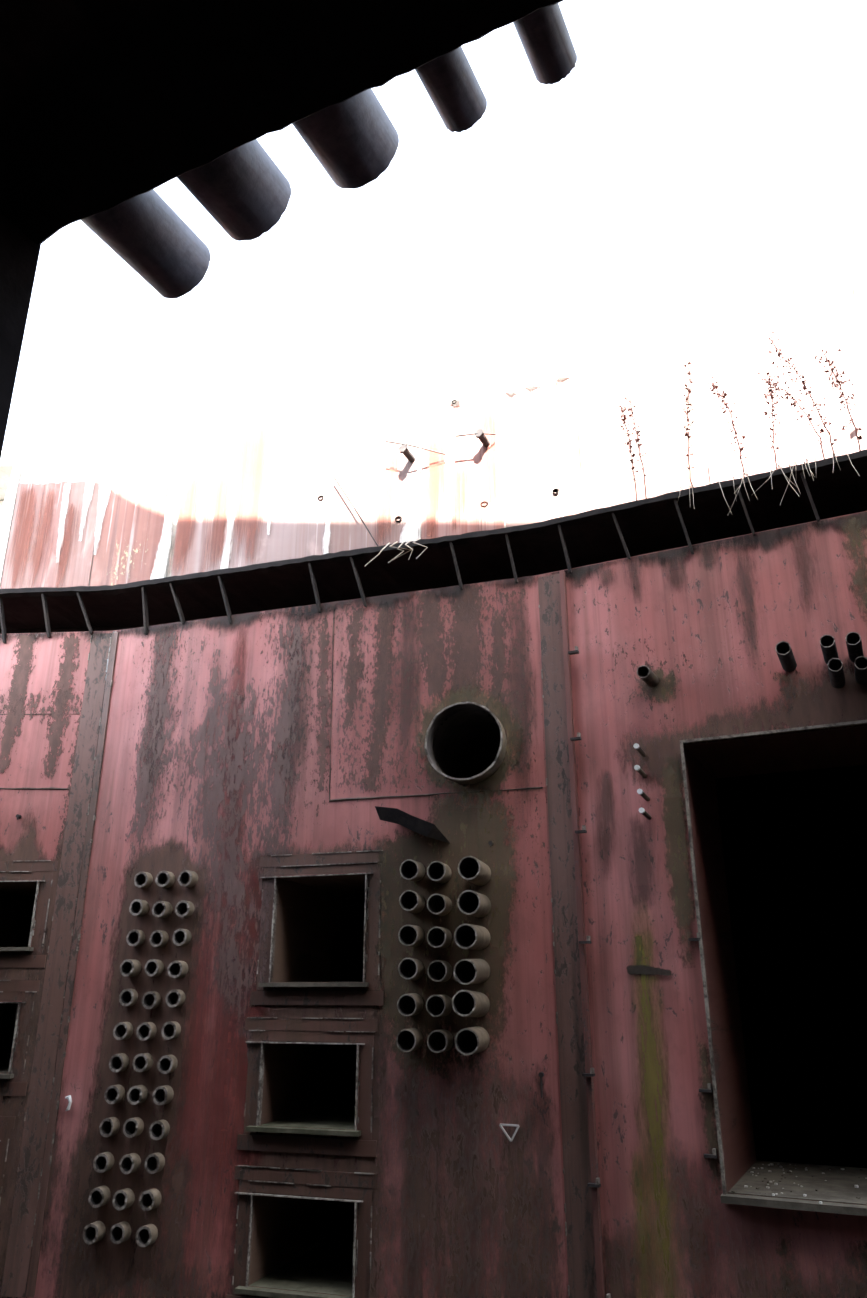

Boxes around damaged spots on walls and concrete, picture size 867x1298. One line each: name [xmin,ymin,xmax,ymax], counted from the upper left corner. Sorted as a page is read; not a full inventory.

leakage [56,473,114,563]
leakage [150,462,178,580]
leakage [220,448,240,569]
leakage [323,500,331,554]
leakage [400,473,420,543]
leakage [551,511,867,645]
peeling [125,584,549,1073]
leakage [0,576,562,1298]
leakage [603,659,867,1298]